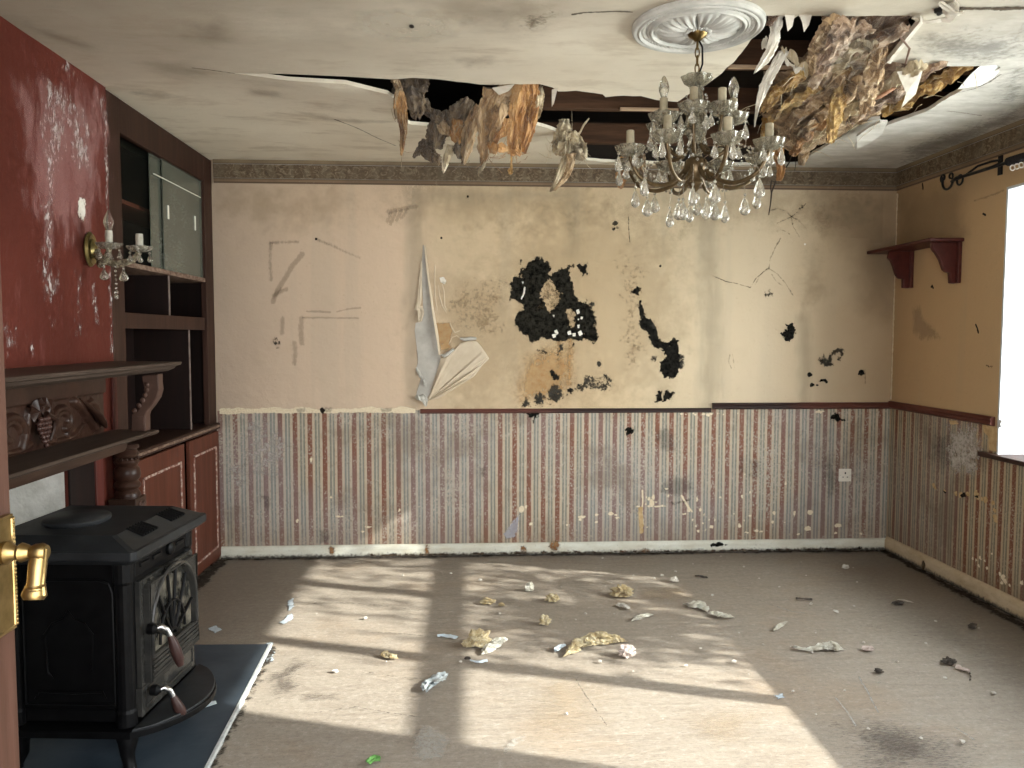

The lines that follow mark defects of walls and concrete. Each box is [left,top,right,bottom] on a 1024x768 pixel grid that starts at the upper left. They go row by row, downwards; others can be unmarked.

peeling [911,0,964,24]
leakage [40,81,90,193]
leakage [43,205,56,296]
leakage [509,256,612,423]
leakage [631,286,685,403]
leakage [780,323,796,342]
leakage [807,348,844,387]
leakage [945,422,983,478]
peeling [636,488,716,534]